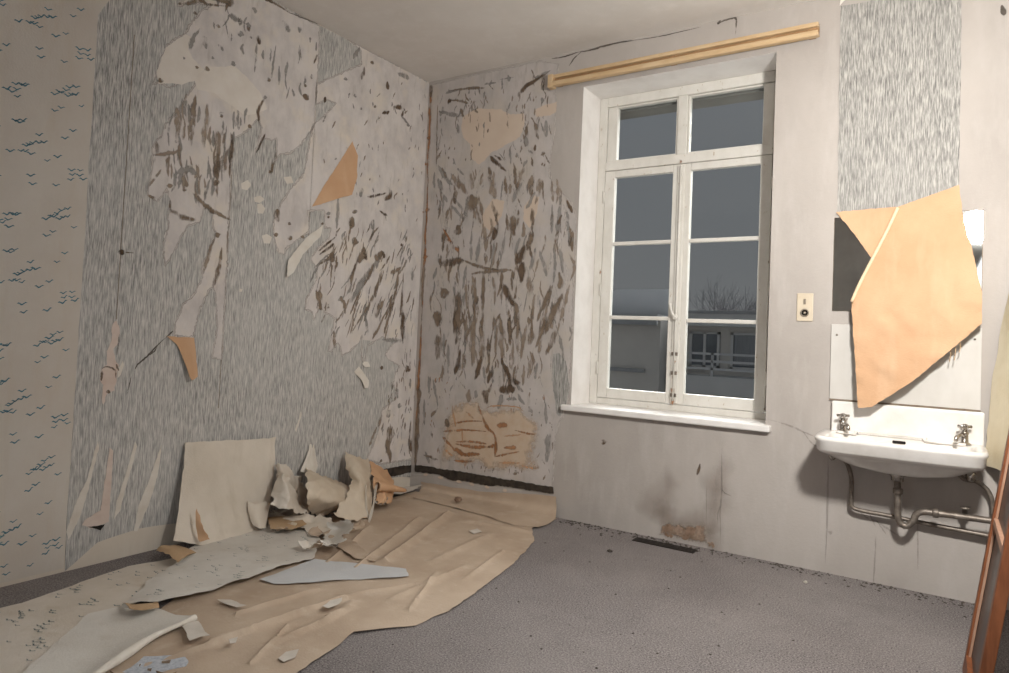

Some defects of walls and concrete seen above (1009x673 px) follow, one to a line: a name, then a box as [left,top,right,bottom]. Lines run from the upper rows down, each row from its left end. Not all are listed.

peeling [147,0,577,486]
flaking render [661,523,715,548]